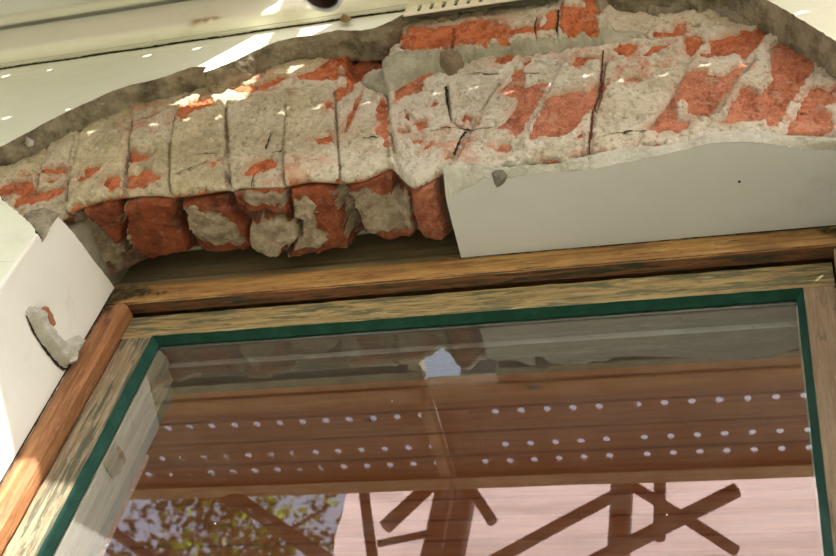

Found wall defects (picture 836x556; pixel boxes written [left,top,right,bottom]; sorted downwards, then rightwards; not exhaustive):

flaking render [0,0,836,275]
crack [436,86,493,155]
crack [588,50,646,155]